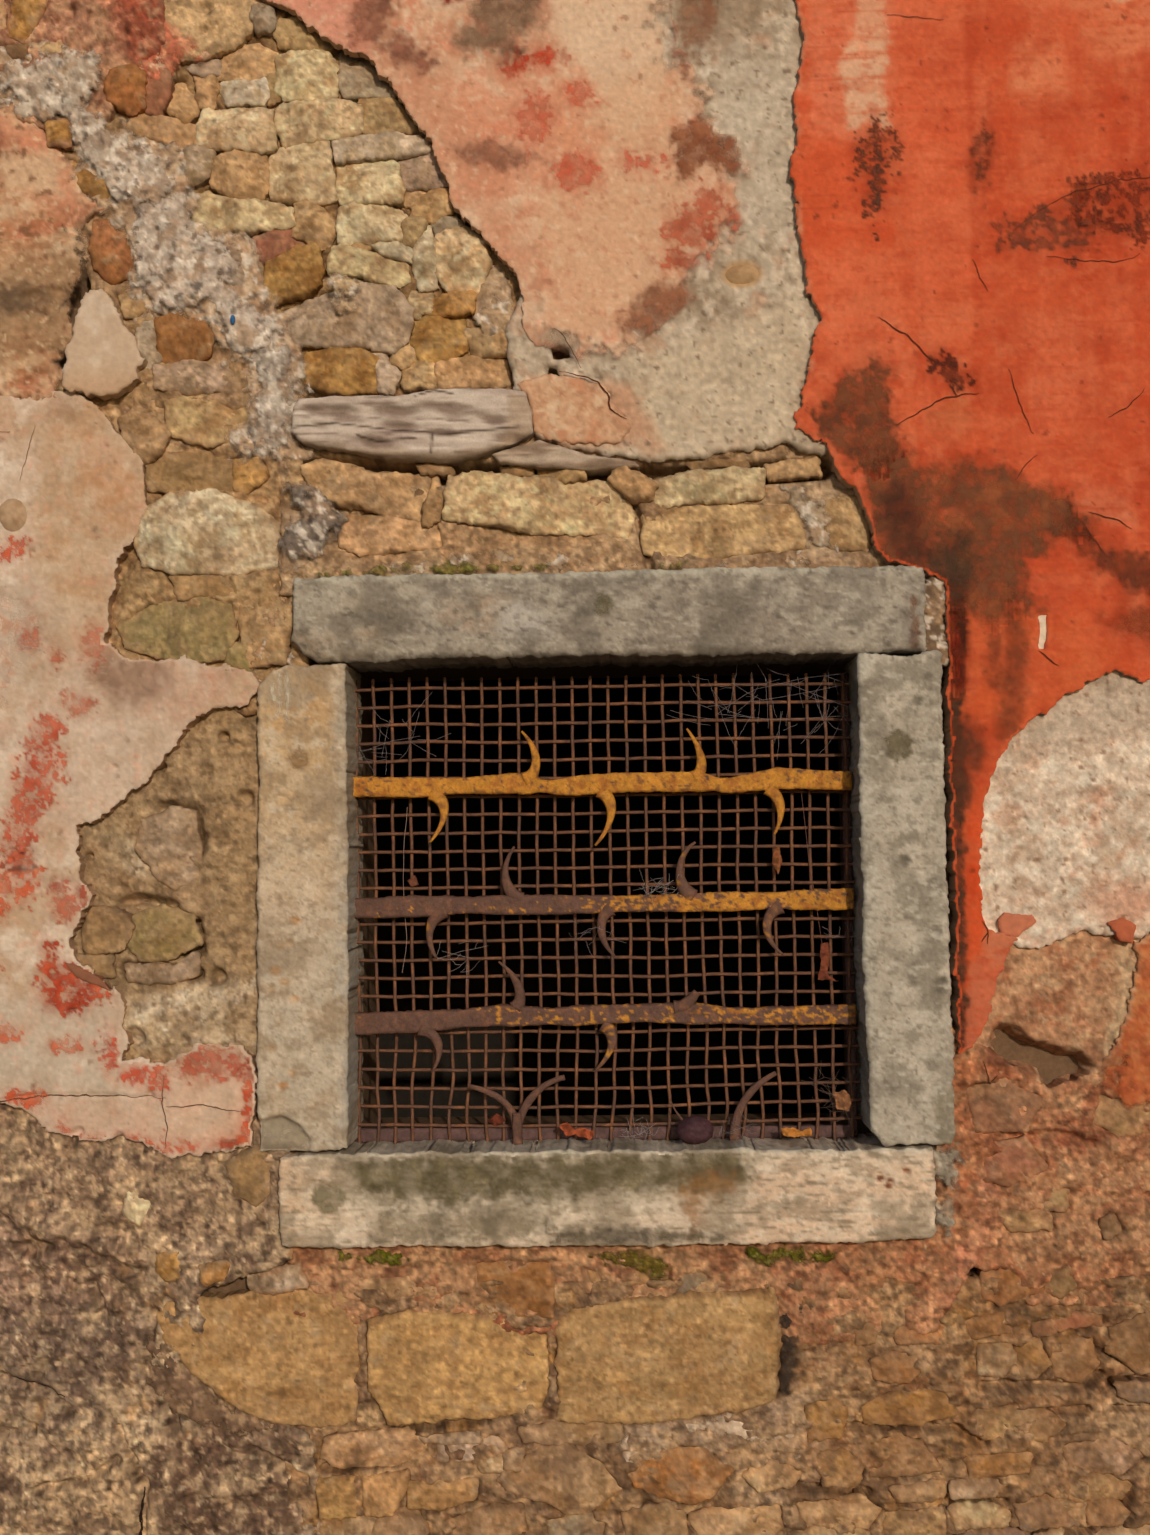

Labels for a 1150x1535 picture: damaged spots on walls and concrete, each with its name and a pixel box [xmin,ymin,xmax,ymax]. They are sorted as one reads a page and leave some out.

leakage [848,114,904,241]
leakage [971,132,993,180]
leakage [998,169,1150,266]
leakage [927,349,976,392]
flaking render [0,0,898,1062]
leakage [811,359,1150,1048]
flaking render [0,670,1150,1535]